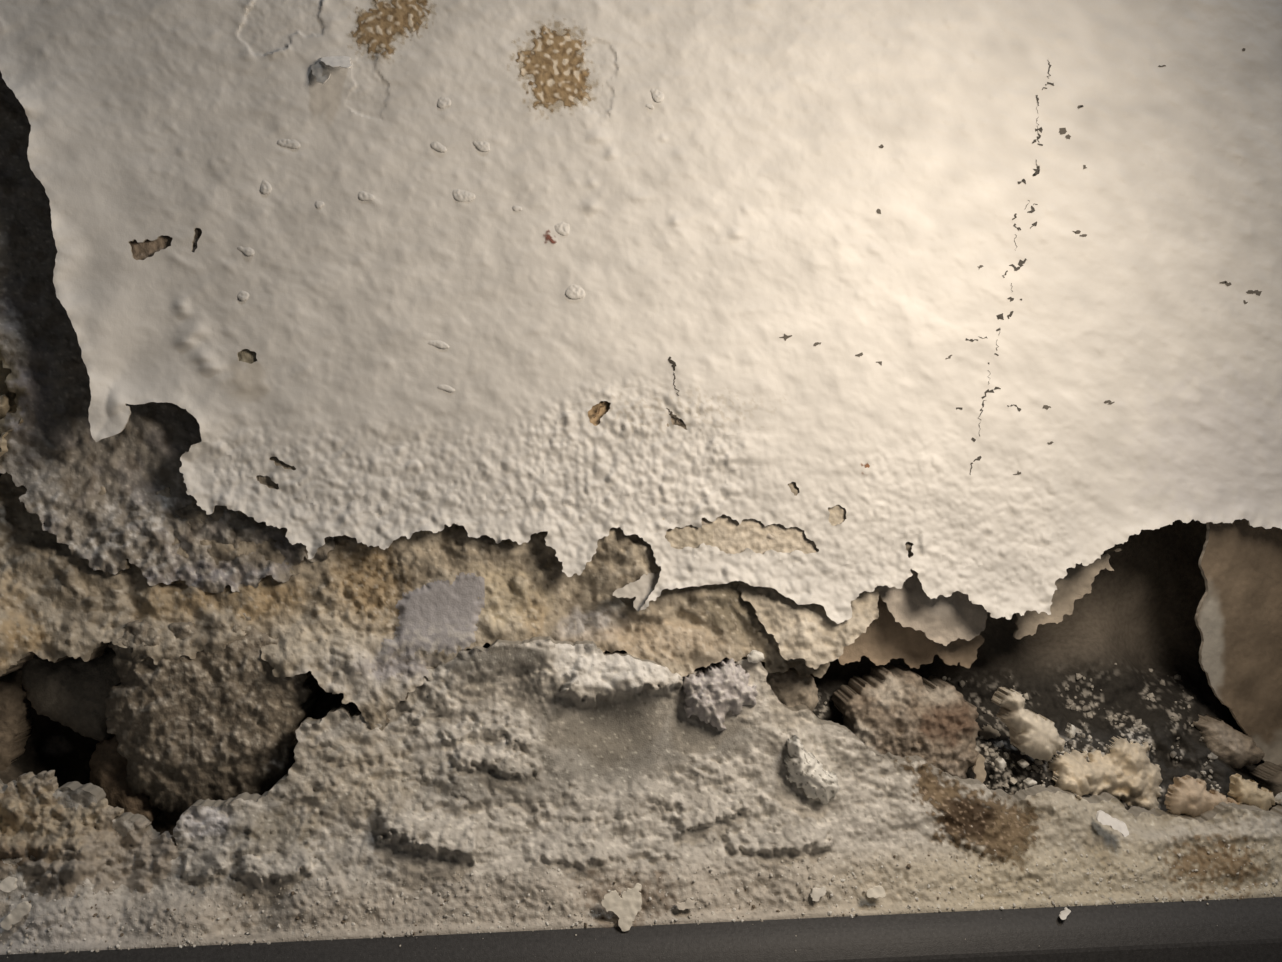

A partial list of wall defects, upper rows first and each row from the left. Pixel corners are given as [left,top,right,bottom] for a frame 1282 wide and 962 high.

flaking render [0,52,336,593]
peeling [311,56,352,84]
peeling [581,37,619,118]
crack [956,61,1054,475]
spalling [0,442,1282,955]